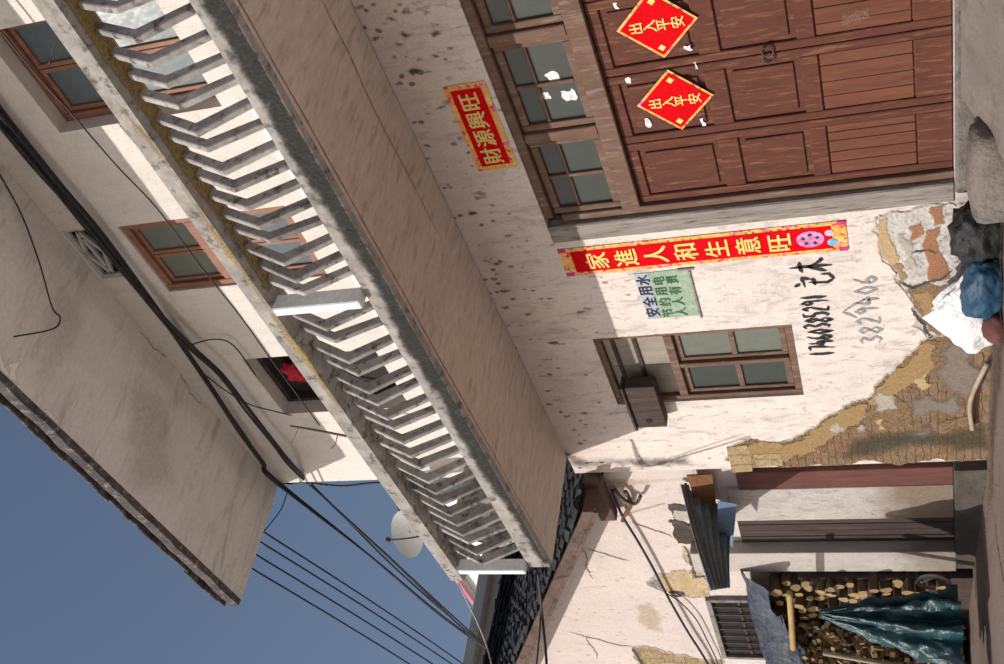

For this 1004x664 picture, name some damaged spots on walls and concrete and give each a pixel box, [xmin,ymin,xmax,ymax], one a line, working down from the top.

spalling [724,202,992,472]
spalling [646,504,710,599]
spalling [631,645,725,664]